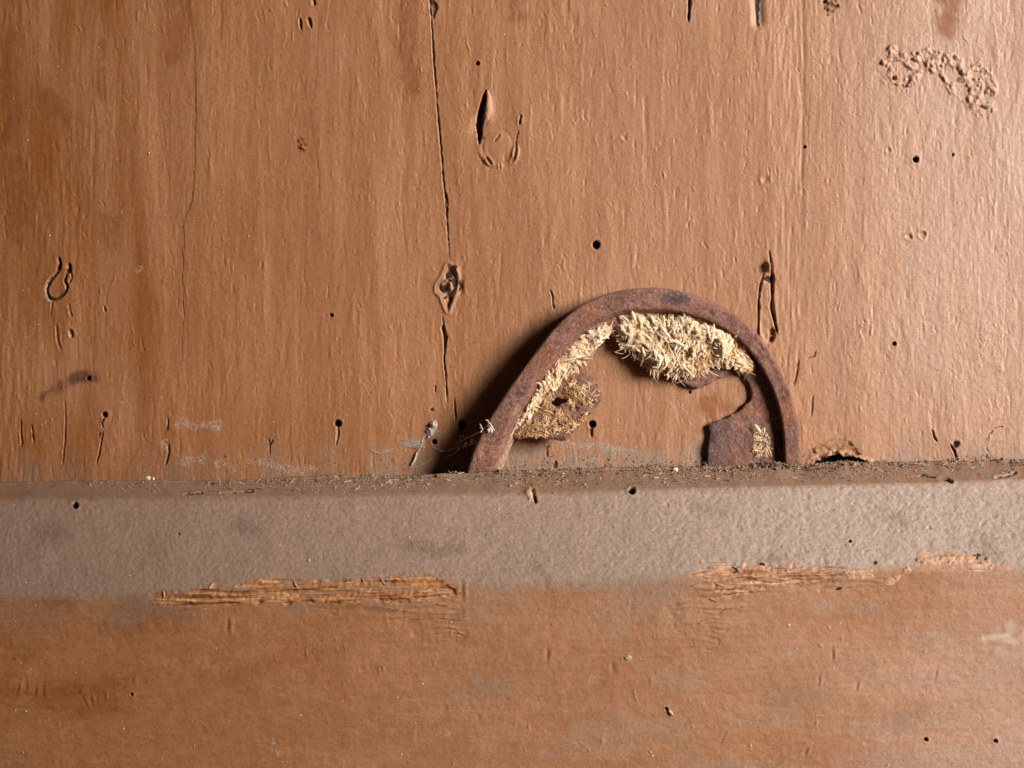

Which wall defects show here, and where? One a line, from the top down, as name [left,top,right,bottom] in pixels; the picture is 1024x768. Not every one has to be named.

crack [429,0,451,264]
crack [430,316,457,420]
rust [466,287,802,473]
peeling [807,438,867,467]
peeling [149,573,466,635]
peeling [692,551,995,613]